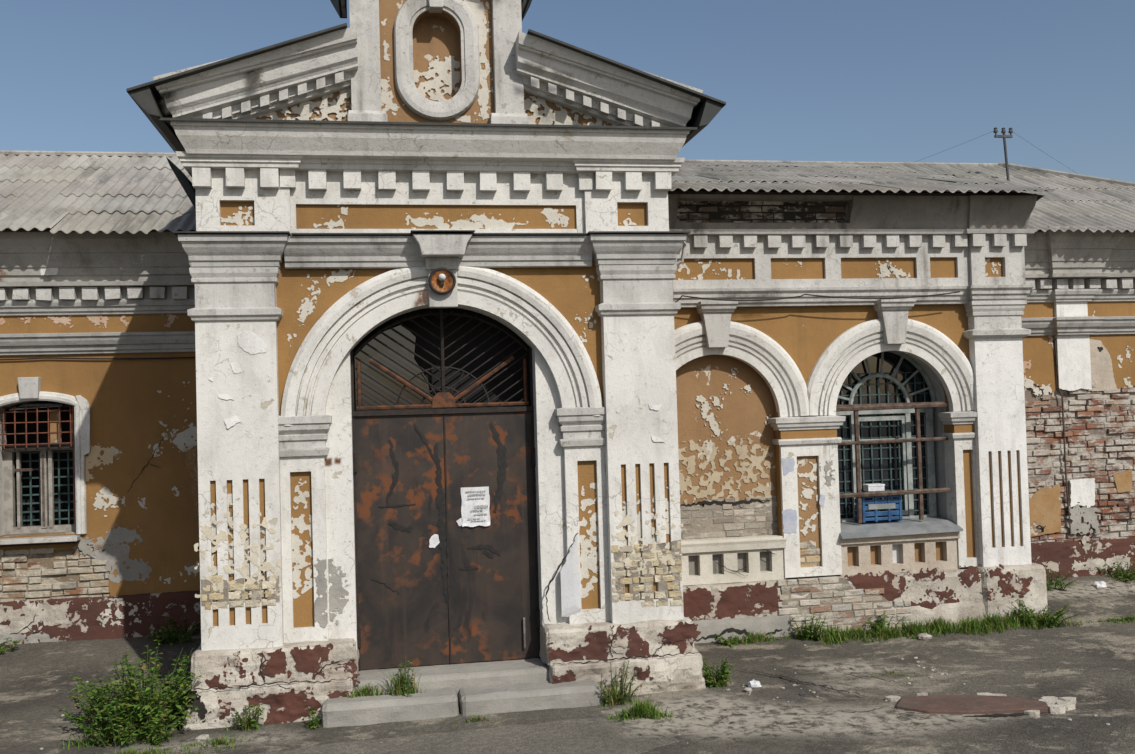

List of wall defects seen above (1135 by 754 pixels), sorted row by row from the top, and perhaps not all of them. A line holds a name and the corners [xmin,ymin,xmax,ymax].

peeling [413,55,460,101]
peeling [405,212,528,229]
peeling [540,207,569,228]
peeling [0,315,74,328]
peeling [87,315,130,328]
flaking render [1023,339,1135,572]
flaking render [0,443,349,644]
crack [680,498,770,508]
flaking render [547,368,1033,684]
peeling [180,643,360,725]